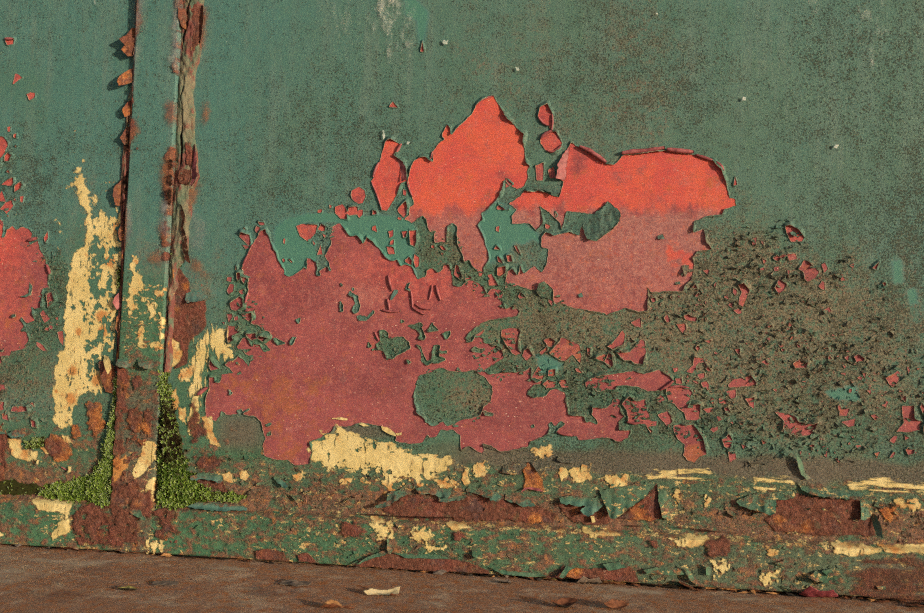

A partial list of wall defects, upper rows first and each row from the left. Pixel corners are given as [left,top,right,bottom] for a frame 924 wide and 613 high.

rust [119,0,142,56]
rust [117,68,139,150]
rust [173,249,208,369]
peeling [0,95,924,519]
rust [45,357,182,551]
peeling [32,497,75,541]
peeling [146,537,164,554]
peeling [257,515,488,566]
rust [375,456,678,541]
peeling [669,533,710,548]
rust [736,454,899,538]
peeling [831,477,924,557]